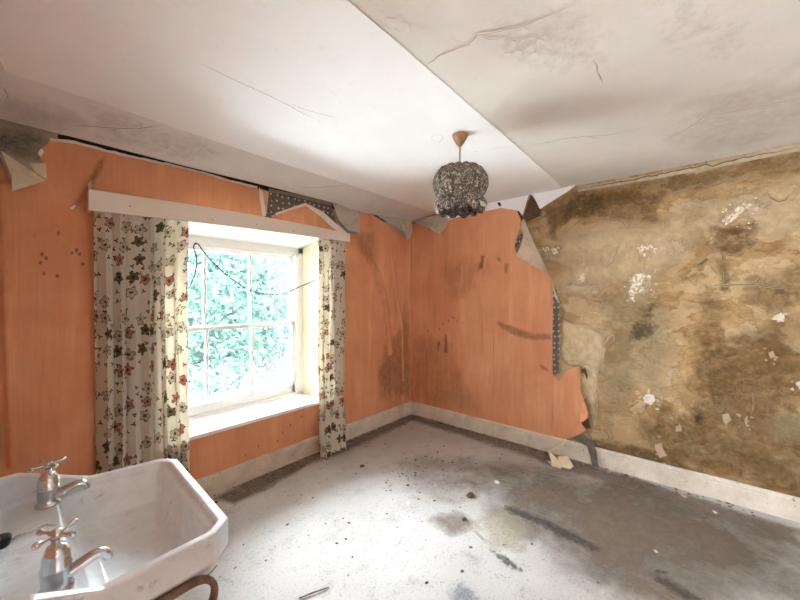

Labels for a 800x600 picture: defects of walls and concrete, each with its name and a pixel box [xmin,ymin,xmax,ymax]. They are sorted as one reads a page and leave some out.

crack [187,56,339,125]
crack [418,2,637,170]
crack [581,147,798,189]
spalling [721,192,770,229]
damp [562,215,688,284]
spalling [624,243,657,304]
damp [562,320,606,426]
damp [601,443,661,463]
spalling [638,389,662,410]
spalling [655,436,669,464]
damp [648,334,800,490]
spalling [723,412,754,430]